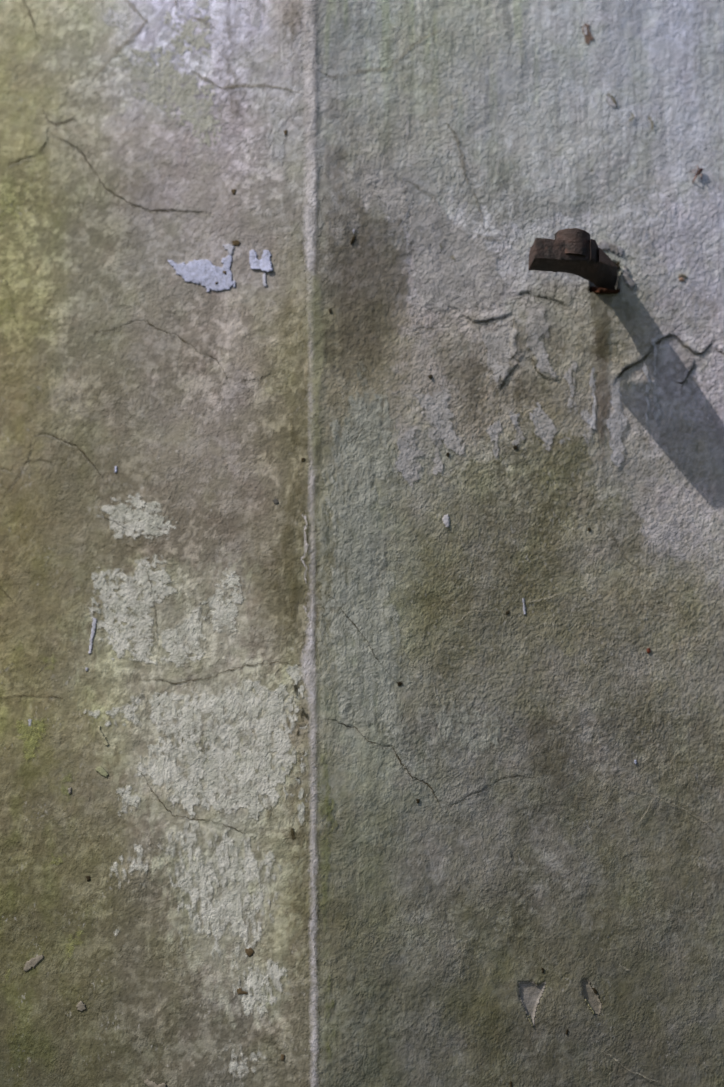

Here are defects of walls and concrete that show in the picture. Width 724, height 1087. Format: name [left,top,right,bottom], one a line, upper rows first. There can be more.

crack [197,73,296,92]
crack [10,108,222,217]
flaking render [486,402,570,459]
flaking render [481,297,592,443]
water stain [587,368,627,466]
crack [617,335,724,384]
crack [324,683,529,815]
flaking render [519,967,546,1027]